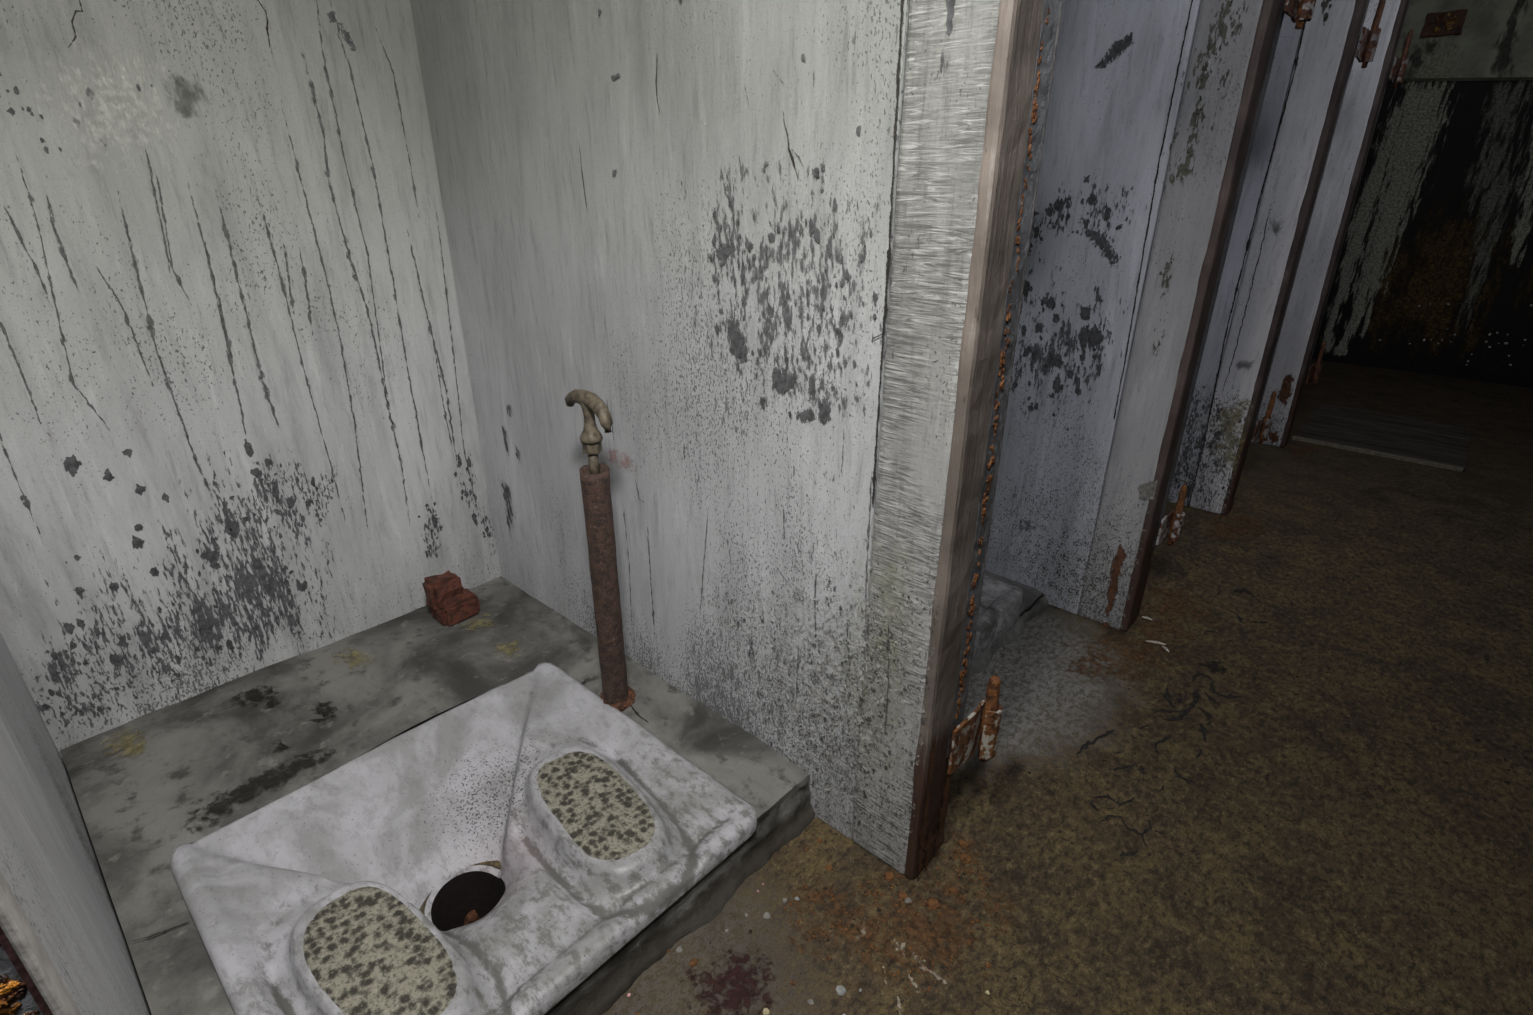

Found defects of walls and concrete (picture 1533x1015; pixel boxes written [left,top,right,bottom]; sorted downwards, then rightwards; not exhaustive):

crack [68,0,84,48]
crack [257,0,270,47]
crack [327,11,356,51]
corrosion [955,6,1050,719]
corrosion [1103,545,1126,628]
corrosion [0,974,39,1015]